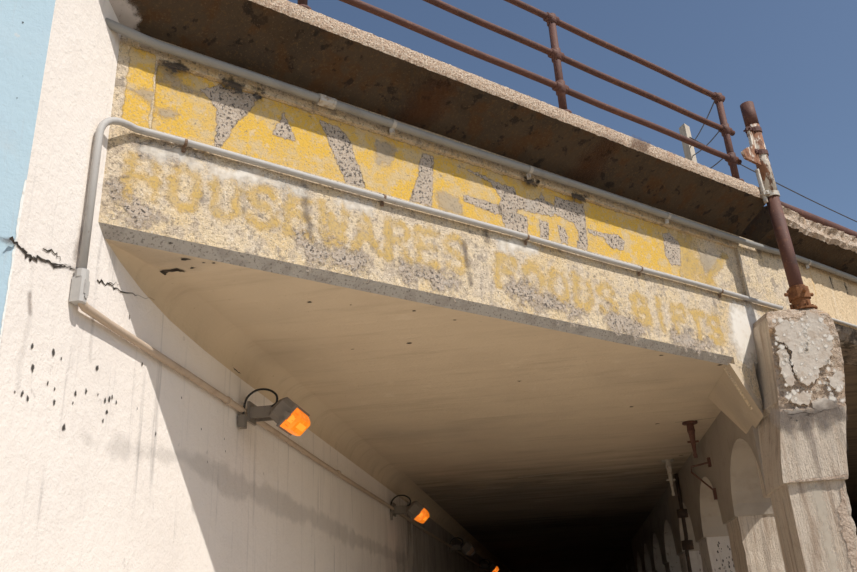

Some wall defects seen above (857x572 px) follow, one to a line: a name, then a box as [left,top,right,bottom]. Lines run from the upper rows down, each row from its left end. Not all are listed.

crack [4,236,75,270]
peeling [294,229,374,271]
crack [97,279,154,300]
peeling [398,257,462,292]
peeling [506,276,588,326]
peeling [601,302,646,339]
peeling [772,305,845,421]